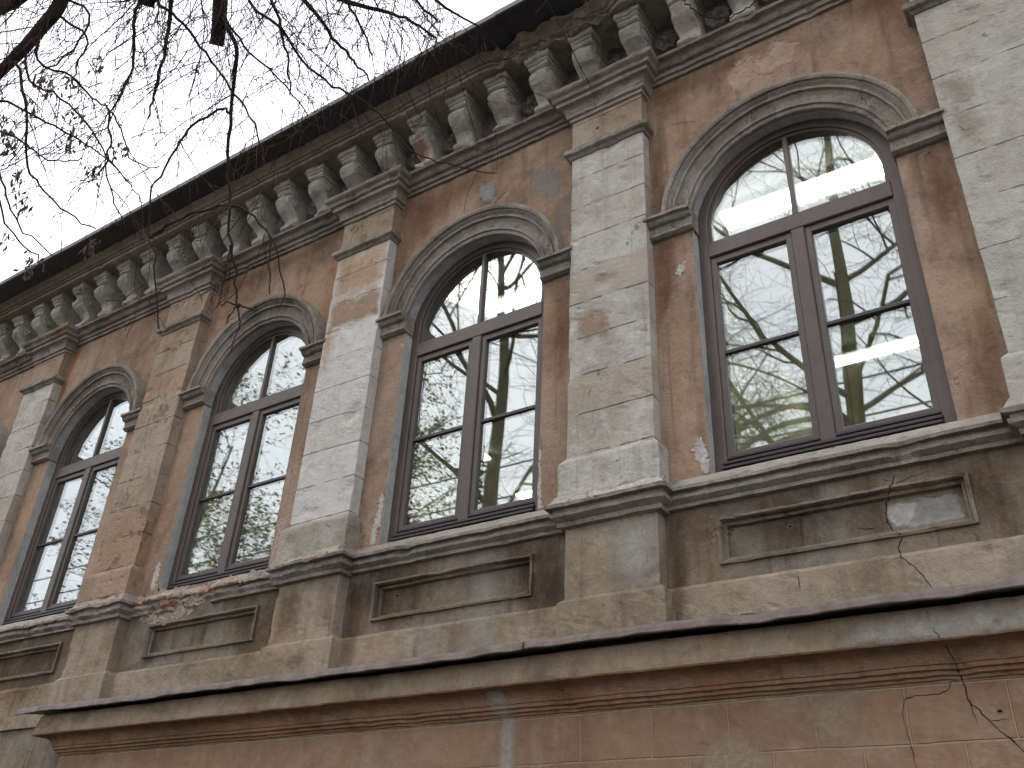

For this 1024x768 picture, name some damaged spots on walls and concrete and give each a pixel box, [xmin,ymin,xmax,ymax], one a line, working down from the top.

flaking render [691,437,710,474]
peeling [886,493,965,530]
flaking render [132,514,345,626]
crack [859,471,1024,764]